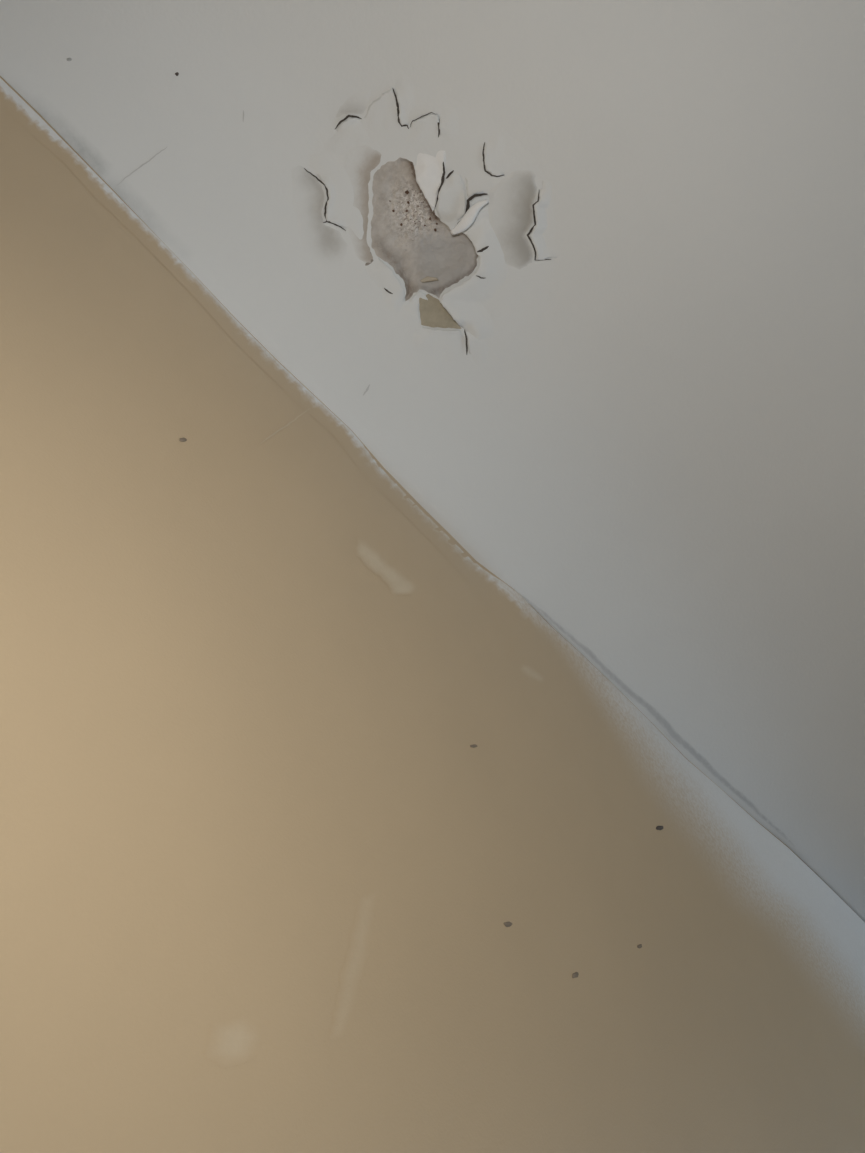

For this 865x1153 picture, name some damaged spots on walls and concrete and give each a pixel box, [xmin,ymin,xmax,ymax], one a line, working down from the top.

peeling [308,73,561,366]